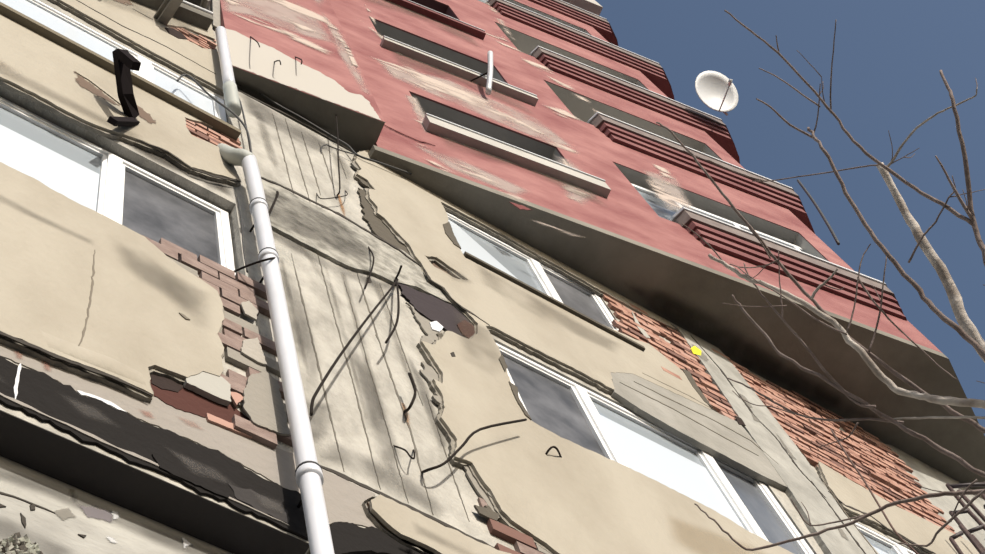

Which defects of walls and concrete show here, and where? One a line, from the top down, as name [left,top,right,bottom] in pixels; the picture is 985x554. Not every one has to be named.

spalling [74,71,119,105]
peeling [165,27,386,123]
peeling [226,0,359,78]
flaking render [185,119,242,149]
flaking render [350,162,415,259]
flaking render [443,222,461,250]
crack [0,250,152,396]
flaking render [142,235,293,450]
spalling [398,283,475,344]
flaking render [499,354,532,420]
flaking render [602,294,962,538]
flaking render [463,466,551,554]